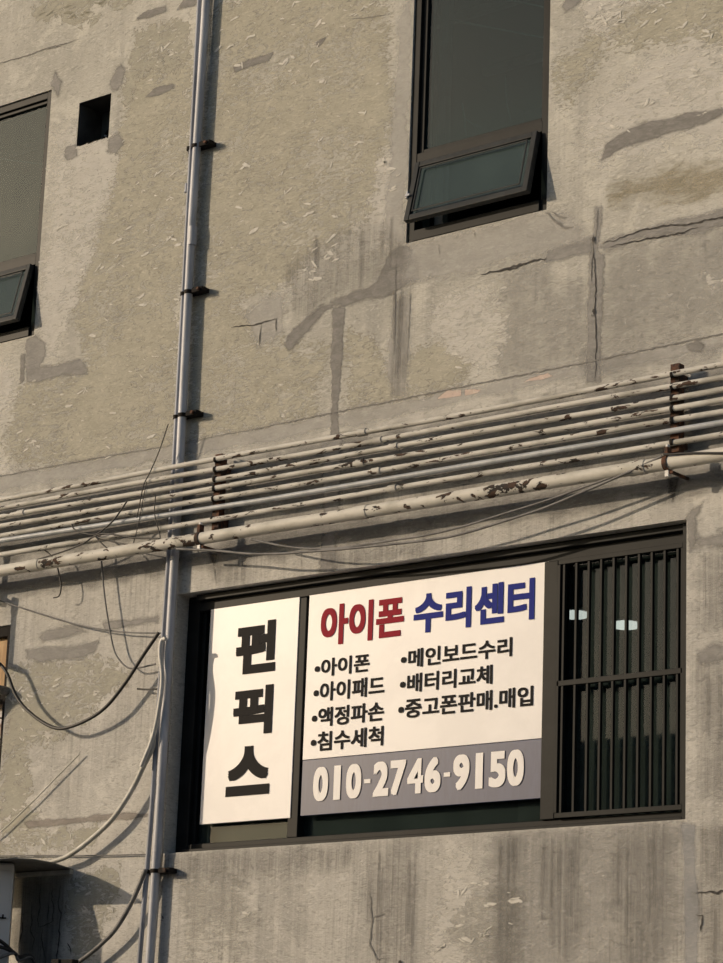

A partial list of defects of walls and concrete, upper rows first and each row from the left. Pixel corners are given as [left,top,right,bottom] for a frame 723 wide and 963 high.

crack [0,208,723,477]
crack [697,890,723,931]